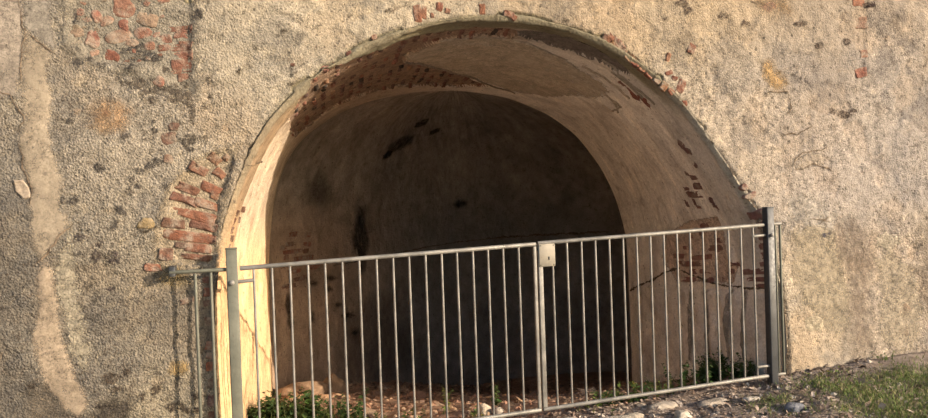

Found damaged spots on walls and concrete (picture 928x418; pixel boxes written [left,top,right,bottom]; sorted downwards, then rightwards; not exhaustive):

spalling [413,2,451,23]
spalling [852,0,876,29]
spalling [57,0,201,96]
peeling [289,10,688,137]
spalling [854,50,868,78]
spalling [161,122,180,164]
spalling [144,145,246,326]
leakage [353,208,368,274]
spalling [662,140,764,289]
crack [630,268,763,291]
spalling [204,341,218,418]